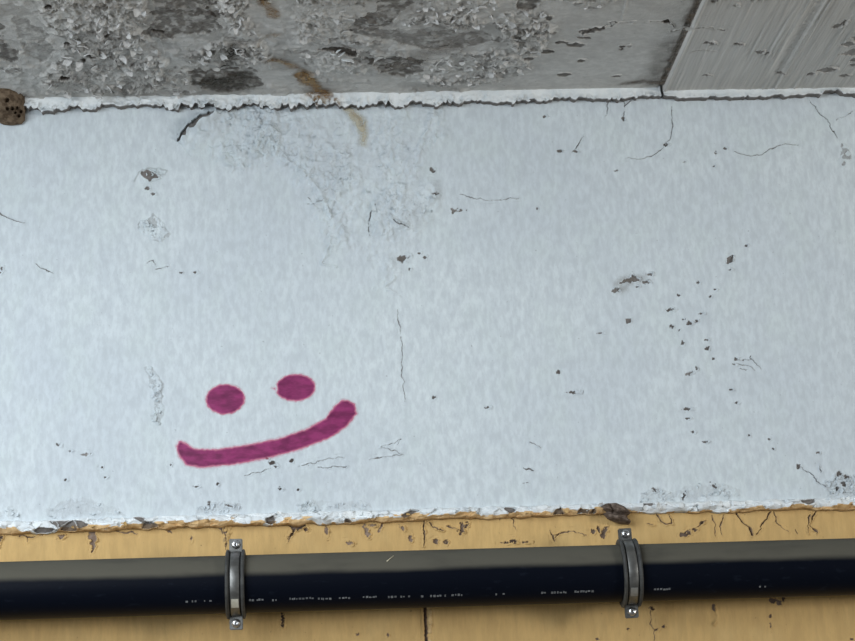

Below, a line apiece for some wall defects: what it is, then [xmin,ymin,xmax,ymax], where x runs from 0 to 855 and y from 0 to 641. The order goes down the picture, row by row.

rust [269,59,366,141]
peeling [0,0,618,300]
crack [0,209,29,226]
crack [643,461,829,540]